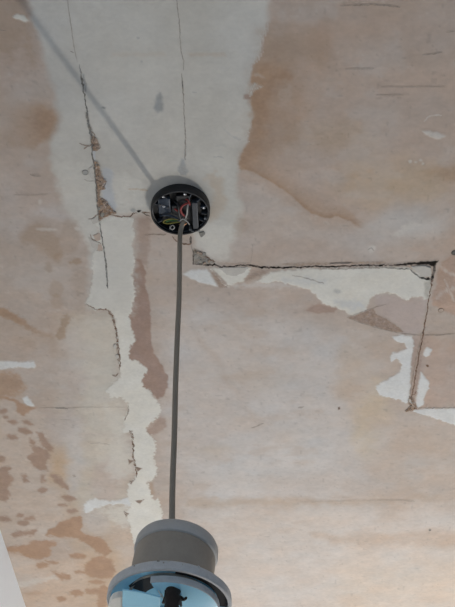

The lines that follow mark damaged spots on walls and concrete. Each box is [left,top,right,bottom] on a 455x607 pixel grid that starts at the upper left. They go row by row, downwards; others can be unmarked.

crack [67,0,150,289]
crack [176,0,187,160]
leakage [233,19,368,230]
leakage [0,369,129,607]
crack [40,405,141,478]
crack [86,303,121,377]
peeling [10,0,280,545]
leakage [130,215,170,400]
leakage [147,414,169,436]
crack [146,231,440,400]
flaking render [182,266,455,427]